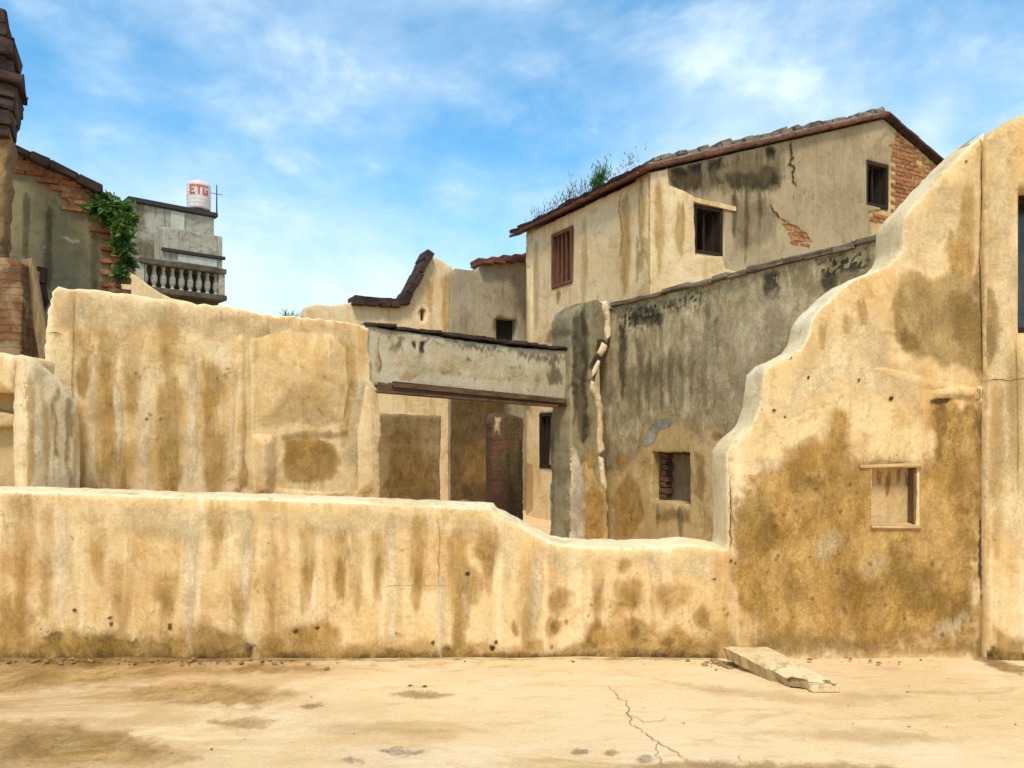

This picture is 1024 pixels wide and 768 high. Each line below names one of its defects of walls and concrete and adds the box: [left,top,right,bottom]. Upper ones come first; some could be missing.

flaking render [15,155,132,294]
damp [671,147,780,245]
crack [787,142,797,187]
flaking render [782,220,813,247]
flaking render [869,133,938,223]
damp [893,186,998,370]
damp [139,354,197,492]
damp [283,379,364,483]
damp [584,183,876,539]
damp [0,518,245,659]
damp [259,513,495,658]
damp [731,398,979,652]